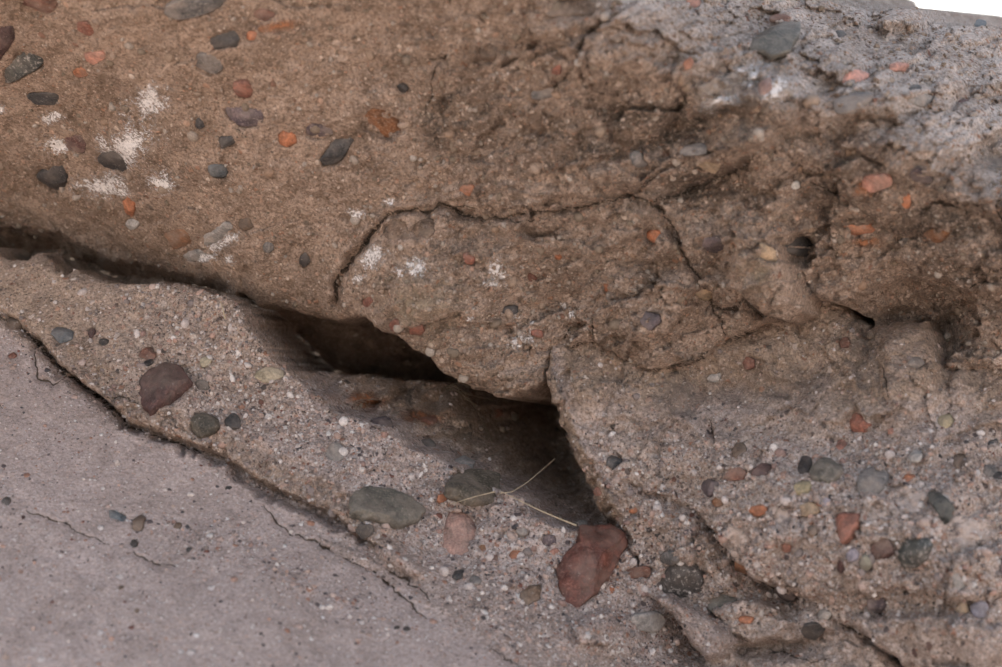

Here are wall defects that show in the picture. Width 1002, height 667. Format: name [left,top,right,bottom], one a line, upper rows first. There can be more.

crack [424,54,452,115]
crack [554,13,619,88]
crack [334,155,774,371]
crack [0,315,202,454]
crack [26,510,109,545]
crack [133,551,176,567]